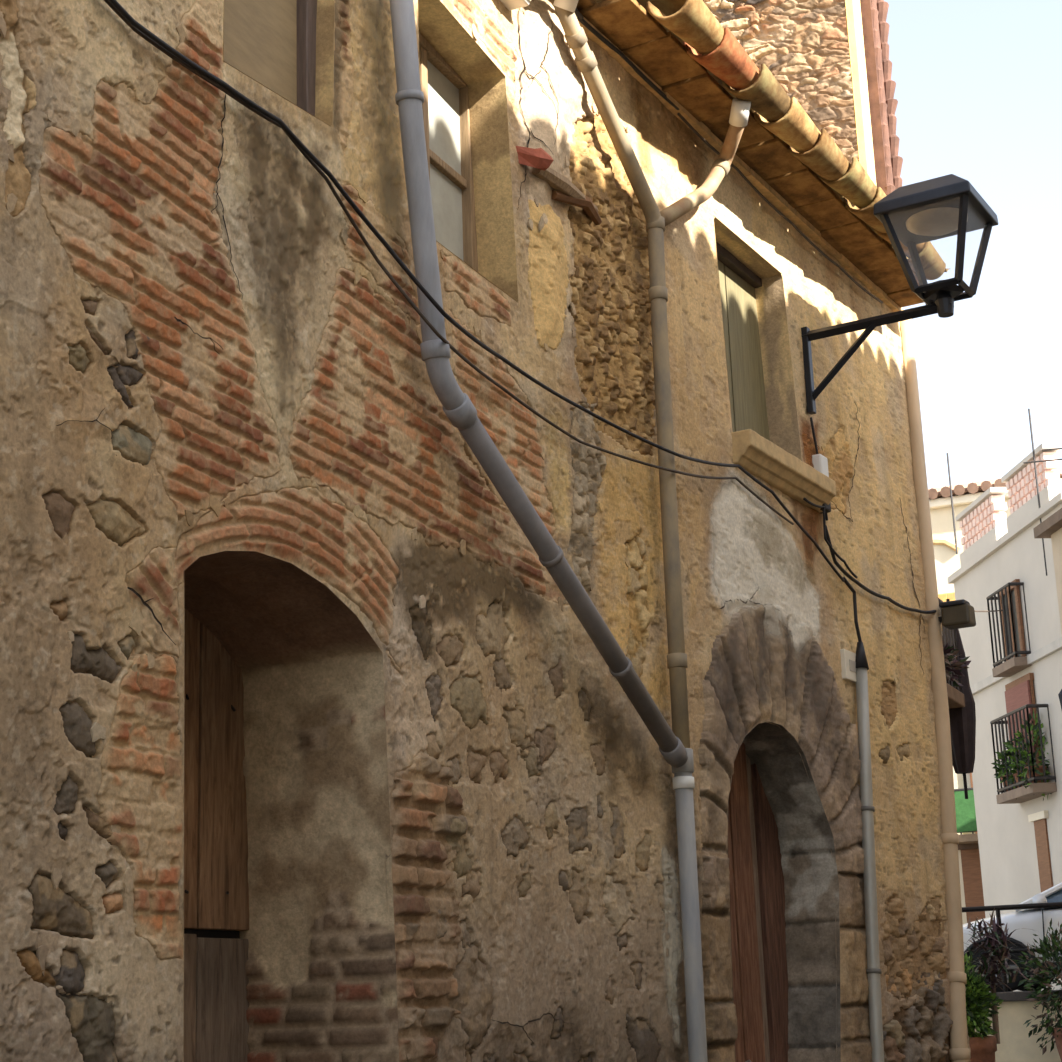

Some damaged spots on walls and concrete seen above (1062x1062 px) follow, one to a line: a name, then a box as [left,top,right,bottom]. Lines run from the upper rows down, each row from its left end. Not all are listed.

crack [211,93,243,297]
damp [250,117,323,354]
crack [517,8,559,210]
spalling [567,103,655,596]
peeling [0,0,569,960]
crack [834,408,860,522]
crack [127,587,176,645]
spalling [624,530,653,678]
peeling [390,595,508,1062]
spalling [544,794,652,872]
spalling [16,868,117,1062]
spalling [626,1014,661,1062]